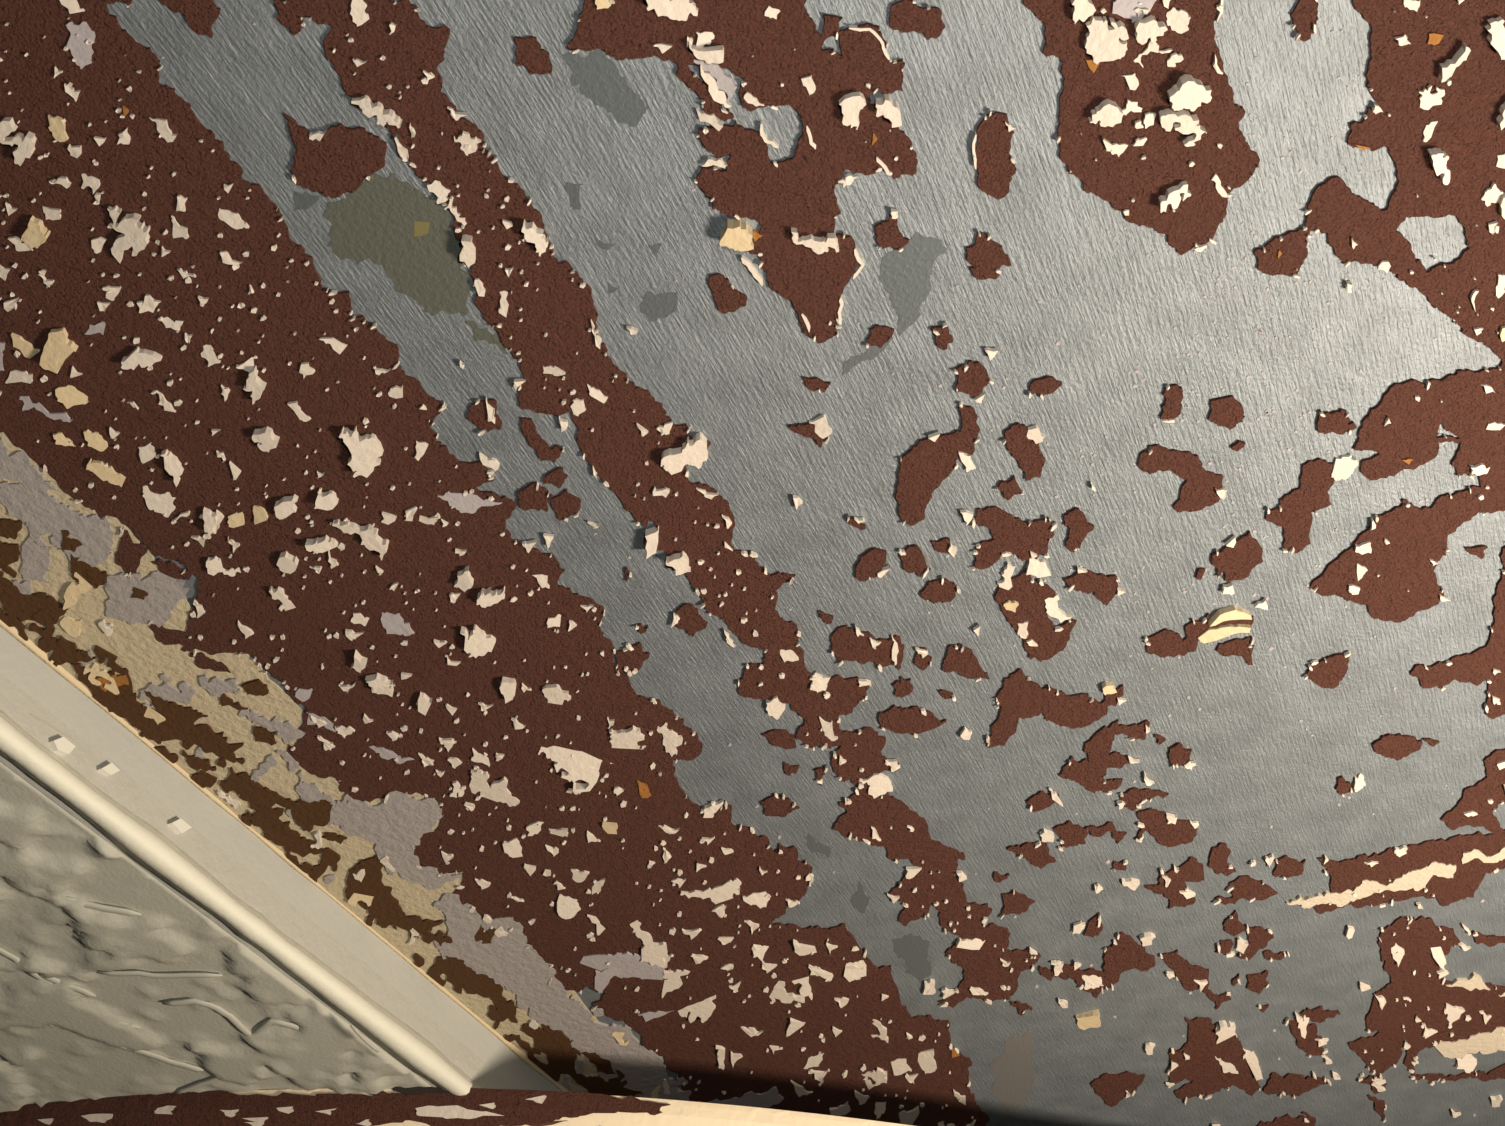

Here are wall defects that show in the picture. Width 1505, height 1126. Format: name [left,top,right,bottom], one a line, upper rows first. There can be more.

peeling [646,0,780,148]
peeling [839,92,902,130]
peeling [1418,42,1471,185]
peeling [91,205,150,263]
peeling [0,321,126,487]
peeling [138,443,184,517]
peeling [339,425,384,478]
peeling [203,490,397,611]
peeling [538,722,683,795]
peeling [1286,846,1505,909]
peeling [580,920,716,1023]
peeling [1431,947,1505,1073]